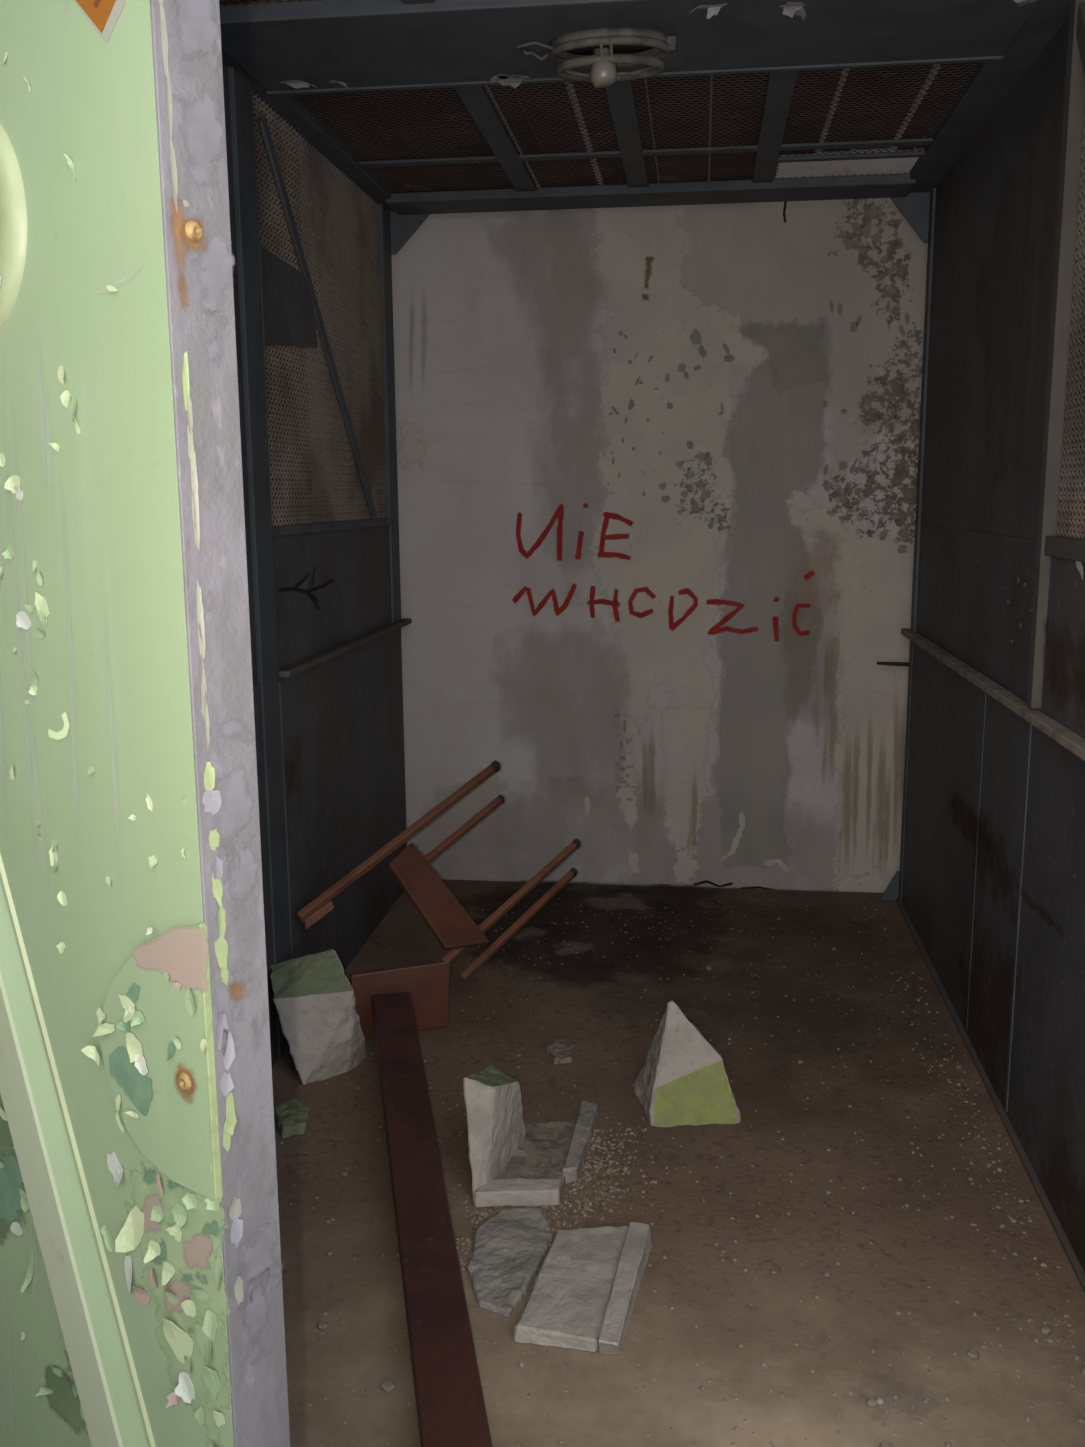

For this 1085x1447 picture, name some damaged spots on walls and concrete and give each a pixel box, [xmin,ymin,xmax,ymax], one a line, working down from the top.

peeling [159,0,224,211]
corrosion [172,204,203,306]
peeling [193,235,234,323]
peeling [58,365,81,435]
peeling [0,452,23,500]
water stain [659,198,923,872]
peeling [16,560,49,639]
peeling [23,671,39,704]
peeling [48,712,70,740]
peeling [132,580,258,1152]
corrosion [176,1066,194,1099]
peeling [100,1151,281,1447]